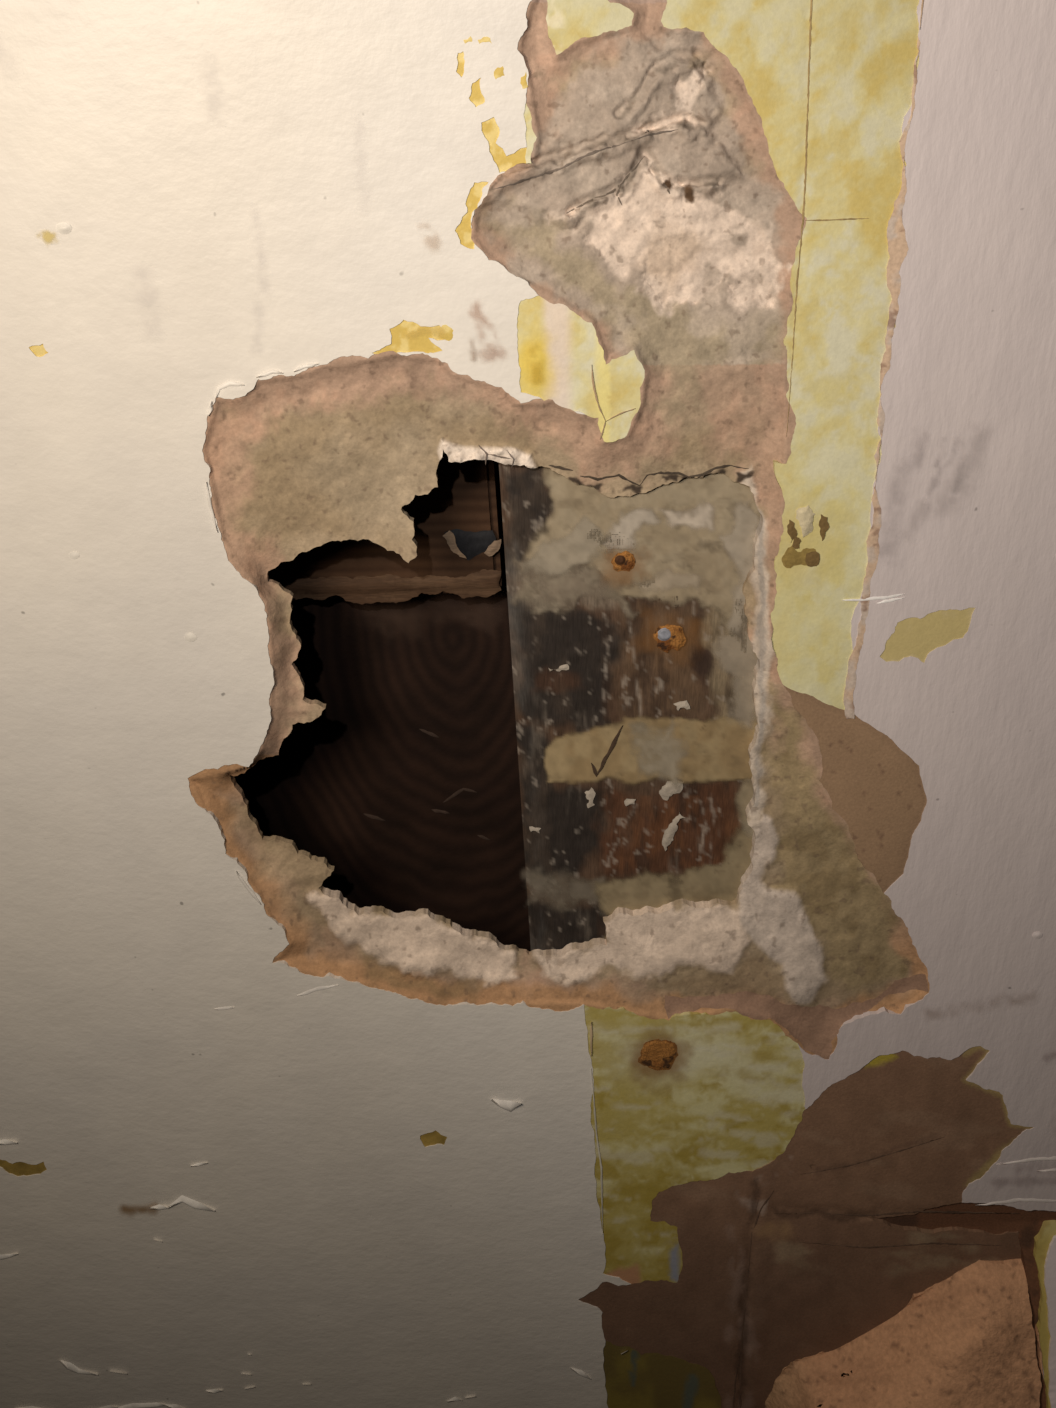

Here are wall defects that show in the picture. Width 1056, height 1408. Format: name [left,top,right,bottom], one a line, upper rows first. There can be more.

spalling [188,0,930,1059]
corrosion [611,551,636,572]
corrosion [653,624,686,653]
peeling [880,608,975,662]
corrosion [638,1039,678,1071]
peeling [420,1130,447,1147]
peeling [579,1005,1034,1408]
crack [733,1191,1056,1408]
spalling [1033,1220,1056,1408]